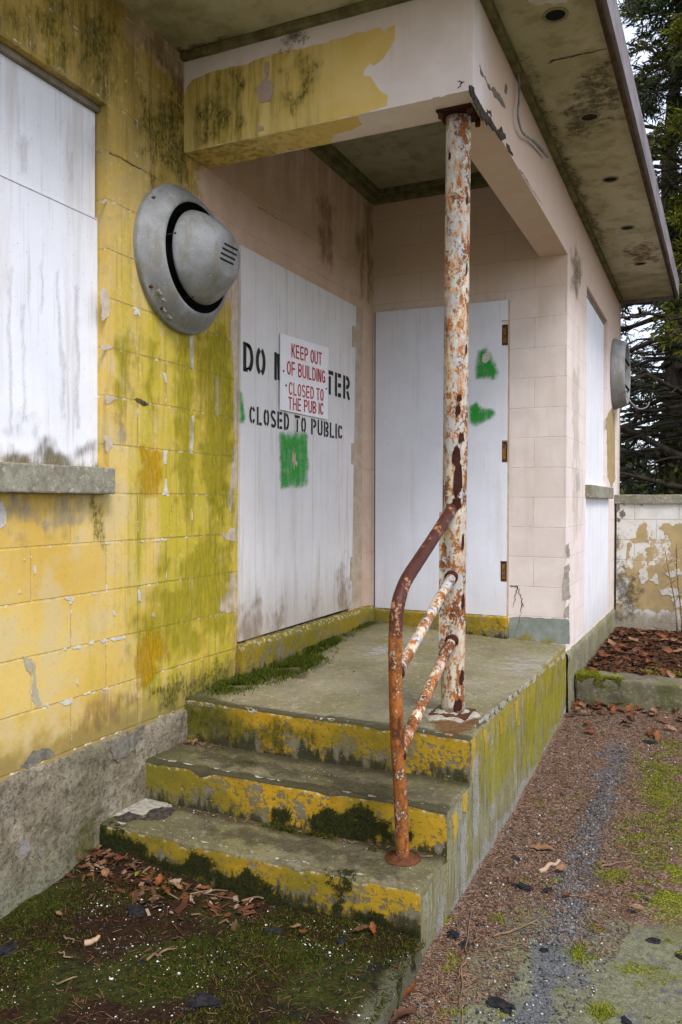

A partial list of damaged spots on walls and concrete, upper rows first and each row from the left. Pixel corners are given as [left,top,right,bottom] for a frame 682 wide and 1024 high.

peeling [184,25,395,168]
spalling [436,66,513,156]
crack [548,49,605,64]
leakage [539,56,622,242]
leakage [176,329,234,519]
corrosion [452,433,464,511]
leakage [137,539,230,651]
peeling [621,522,682,613]
peeling [23,657,108,708]
corrosion [428,698,479,738]
peeling [444,792,468,842]